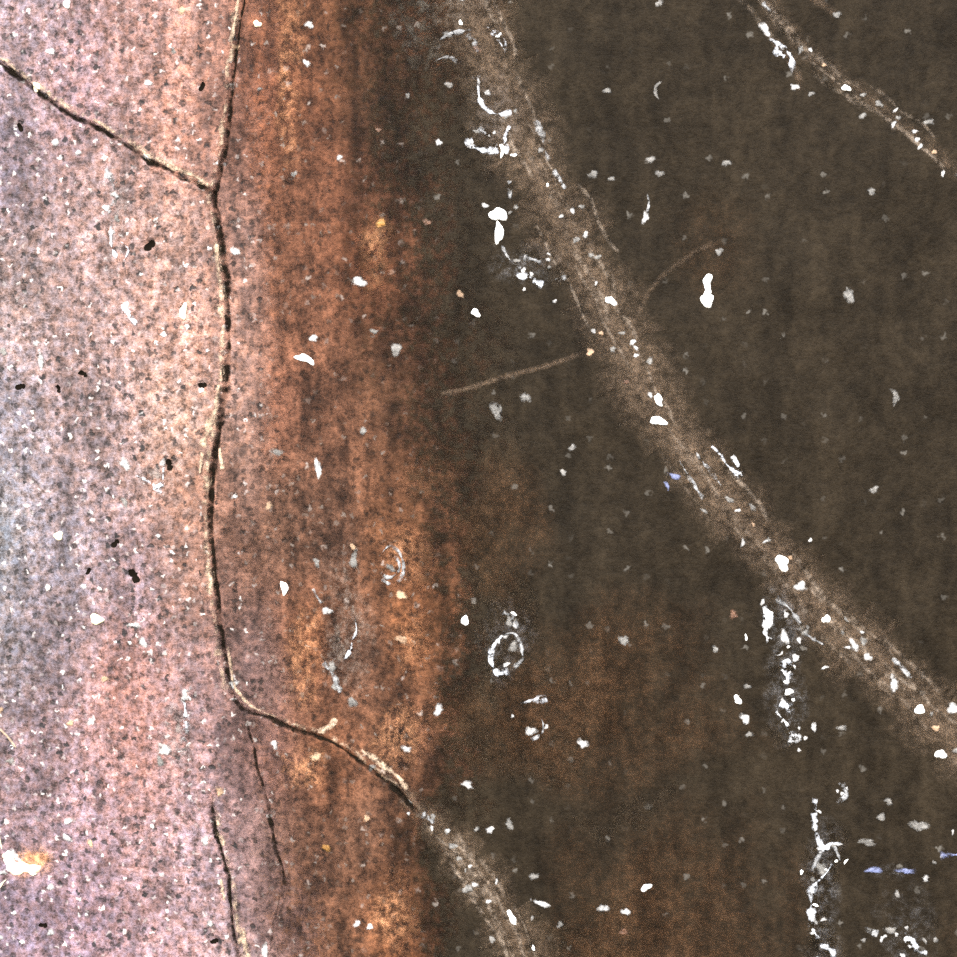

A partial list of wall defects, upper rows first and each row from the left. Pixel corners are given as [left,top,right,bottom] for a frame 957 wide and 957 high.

spalling [0,839,48,888]
crack [0,0,415,904]
crack [211,806,250,957]
water stain [325,662,357,706]
rust [205,0,480,957]
water stain [348,0,957,957]